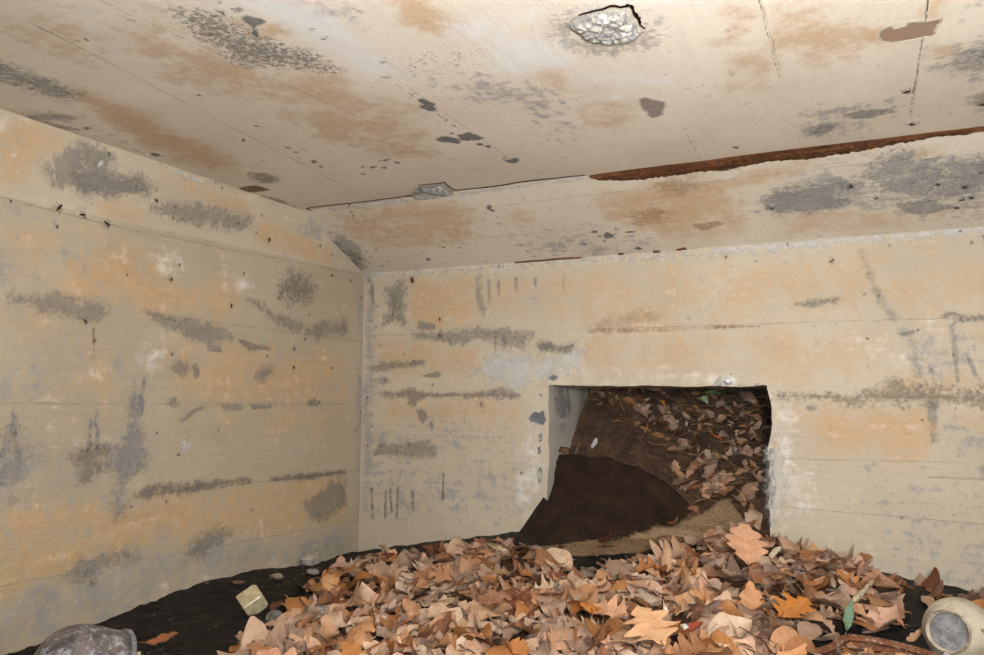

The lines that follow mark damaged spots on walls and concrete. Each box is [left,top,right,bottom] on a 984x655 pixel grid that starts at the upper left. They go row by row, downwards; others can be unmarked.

spalling [568,11,643,45]
peeling [877,18,944,42]
damp [46,144,151,197]
spalling [412,185,454,200]
damp [765,182,849,214]
damp [868,150,984,214]